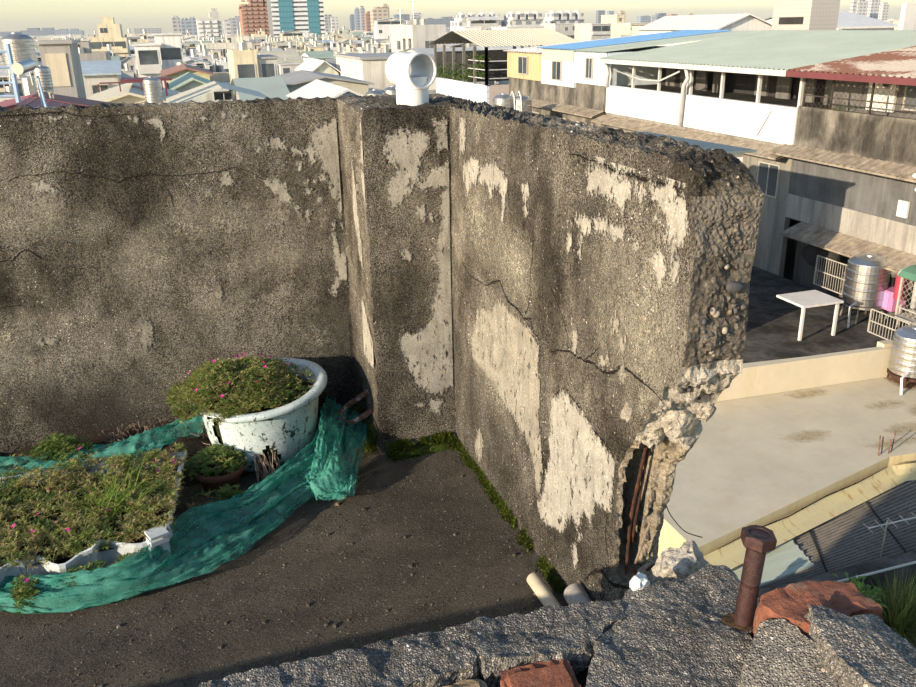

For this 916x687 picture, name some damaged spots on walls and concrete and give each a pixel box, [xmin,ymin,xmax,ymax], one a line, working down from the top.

crack [7,166,314,208]
peeling [253,118,366,296]
peeling [361,298,374,368]
peeling [380,116,453,416]
peeling [458,117,508,222]
peeling [471,298,616,569]
crack [462,234,663,401]
peeling [597,309,629,385]
spalling [620,402,632,422]
peeling [566,157,691,291]
spalling [625,382,716,581]
spalling [699,281,747,369]